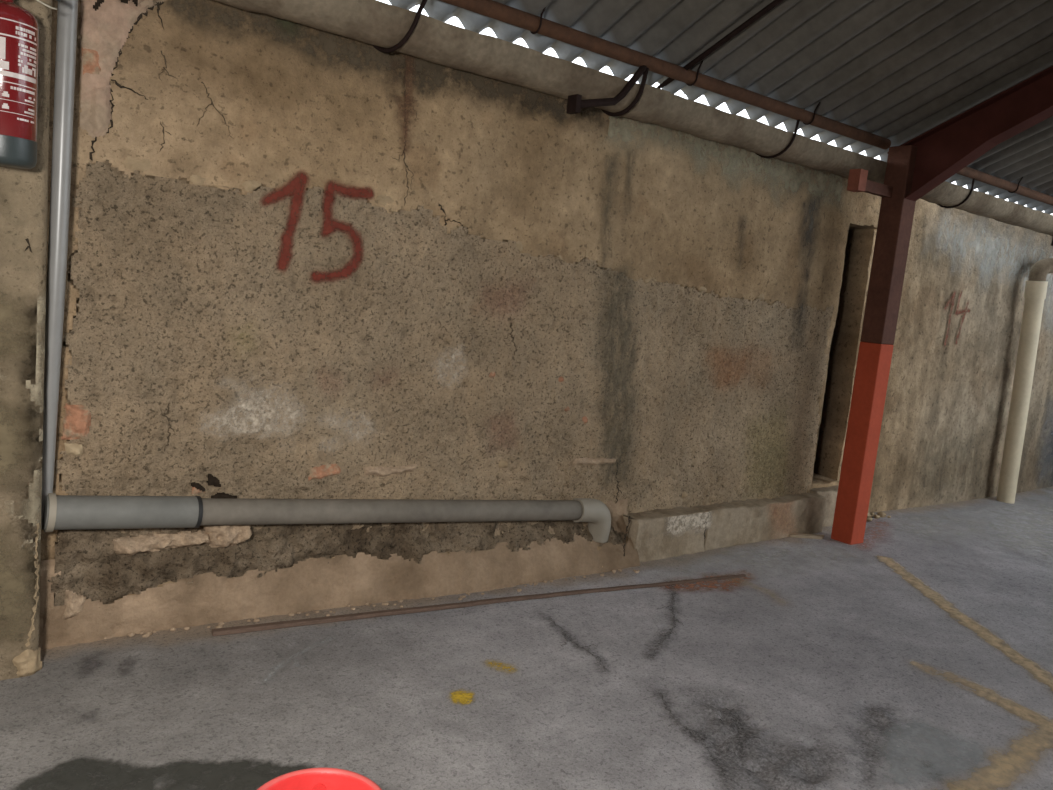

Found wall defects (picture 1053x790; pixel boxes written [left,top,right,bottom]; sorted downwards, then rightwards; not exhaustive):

peeling [79,0,166,138]
crack [89,1,176,162]
crack [197,82,234,139]
spalling [12,156,834,676]
crack [548,617,607,669]
crack [649,585,684,658]
crack [660,693,732,790]